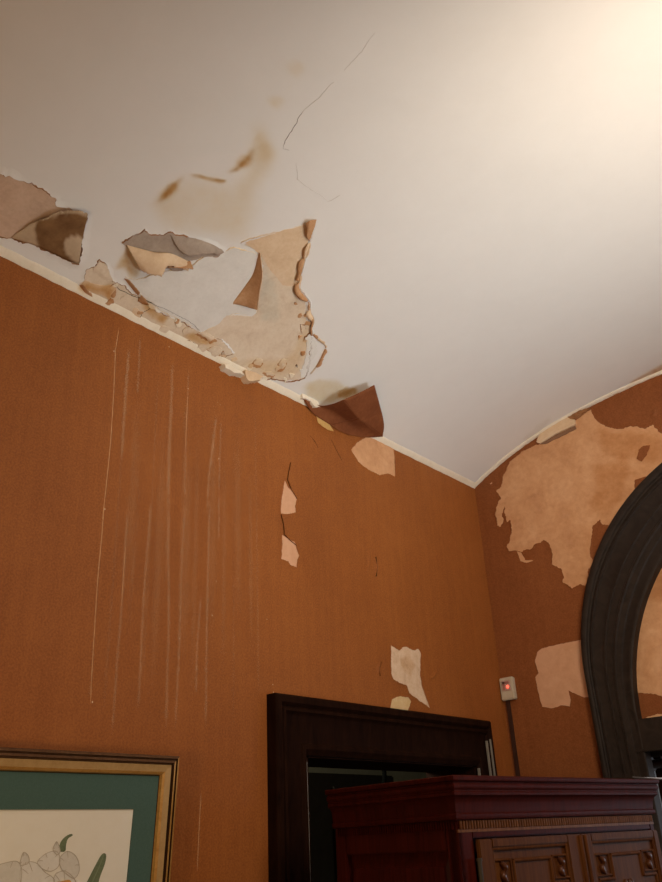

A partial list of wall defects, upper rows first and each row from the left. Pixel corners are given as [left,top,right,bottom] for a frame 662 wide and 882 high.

peeling [0,166,327,384]
peeling [300,394,333,431]